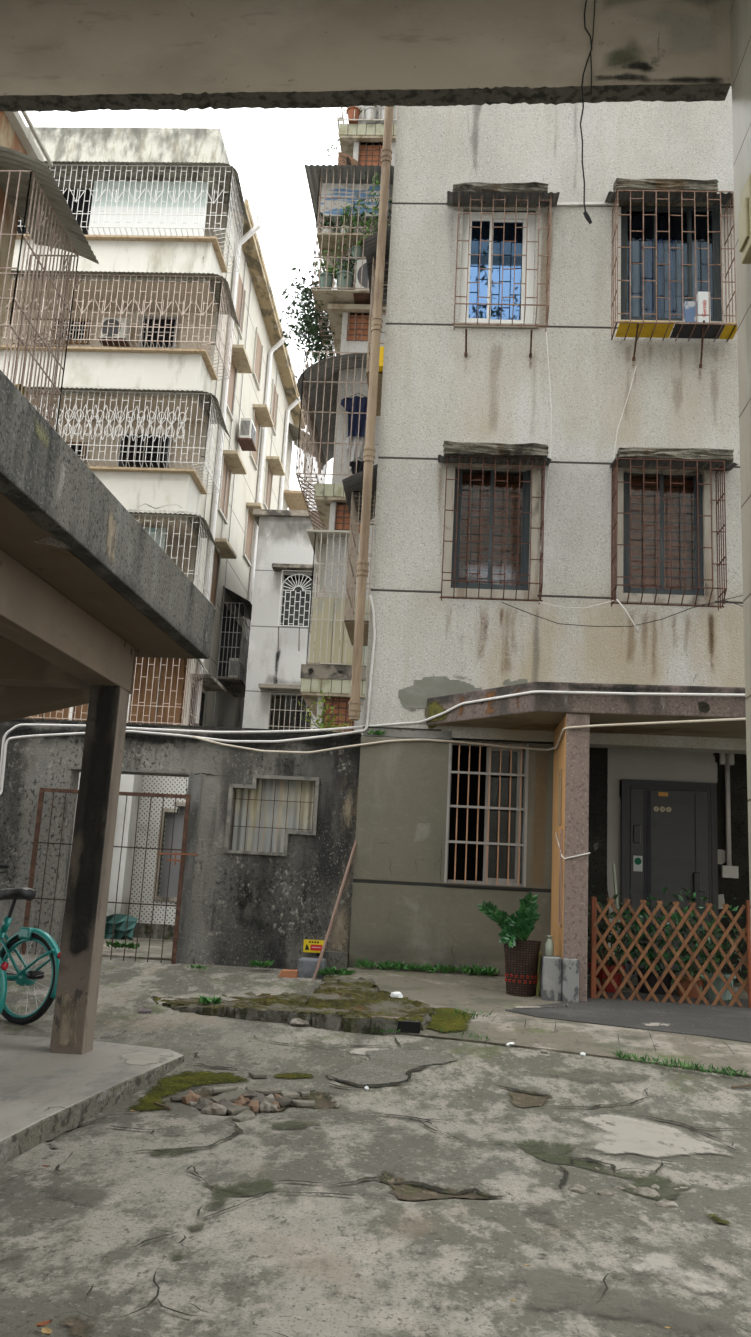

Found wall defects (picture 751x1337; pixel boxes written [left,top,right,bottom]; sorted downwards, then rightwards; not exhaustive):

leakage [598,62,652,81]
spalling [265,1092,341,1113]